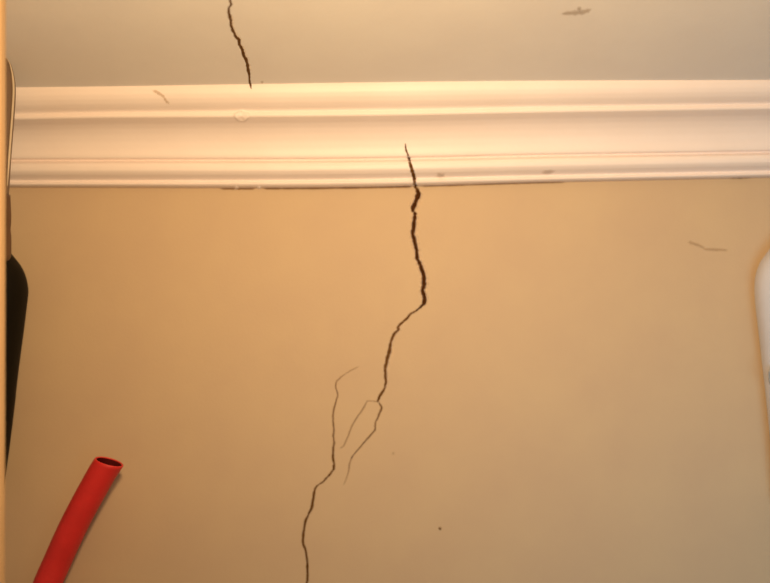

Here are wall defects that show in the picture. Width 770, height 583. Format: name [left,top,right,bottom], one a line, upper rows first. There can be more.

crack [227,0,252,89]
crack [302,143,427,583]